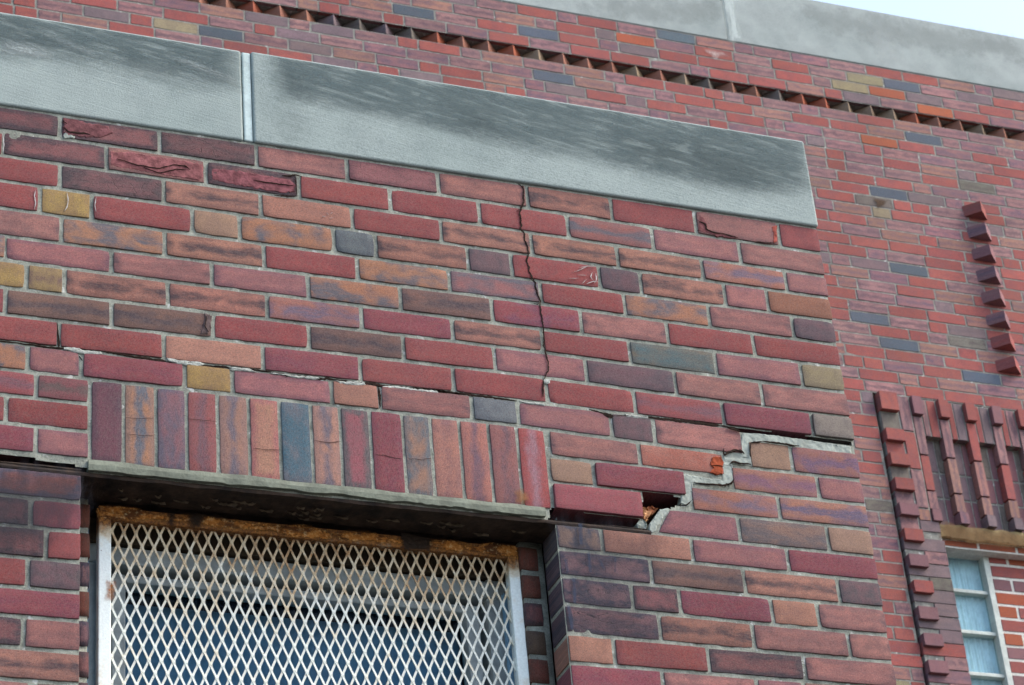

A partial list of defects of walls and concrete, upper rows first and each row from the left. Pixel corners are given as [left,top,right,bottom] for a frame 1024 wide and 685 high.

spalling [63,118,112,139]
spalling [110,151,302,197]
spalling [697,216,777,243]
crack [0,184,551,407]
crack [589,409,852,533]
rust [97,505,519,558]